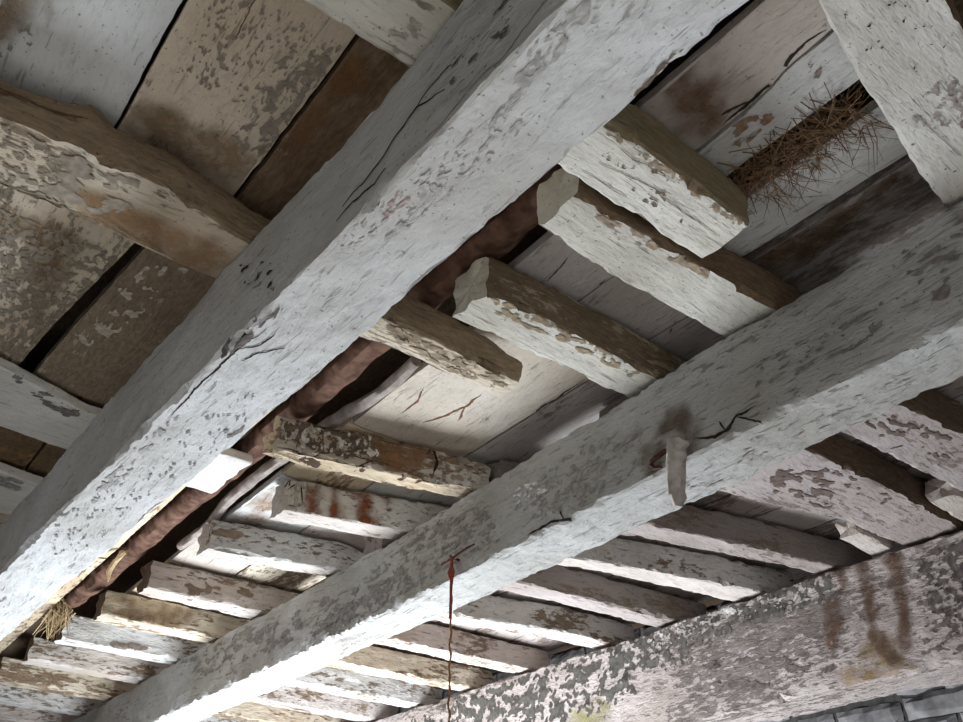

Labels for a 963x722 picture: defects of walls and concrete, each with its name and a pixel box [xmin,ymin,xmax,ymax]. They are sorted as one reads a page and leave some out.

peeling [177,0,341,157]
crack [336,0,546,222]
peeling [0,125,140,215]
crack [173,329,285,413]
spalling [278,418,382,462]
crack [696,406,762,439]
rust [307,489,318,516]
rust [330,490,338,518]
rust [352,491,376,525]
crack [526,511,572,536]
peeling [642,582,811,649]
peeling [916,599,963,655]